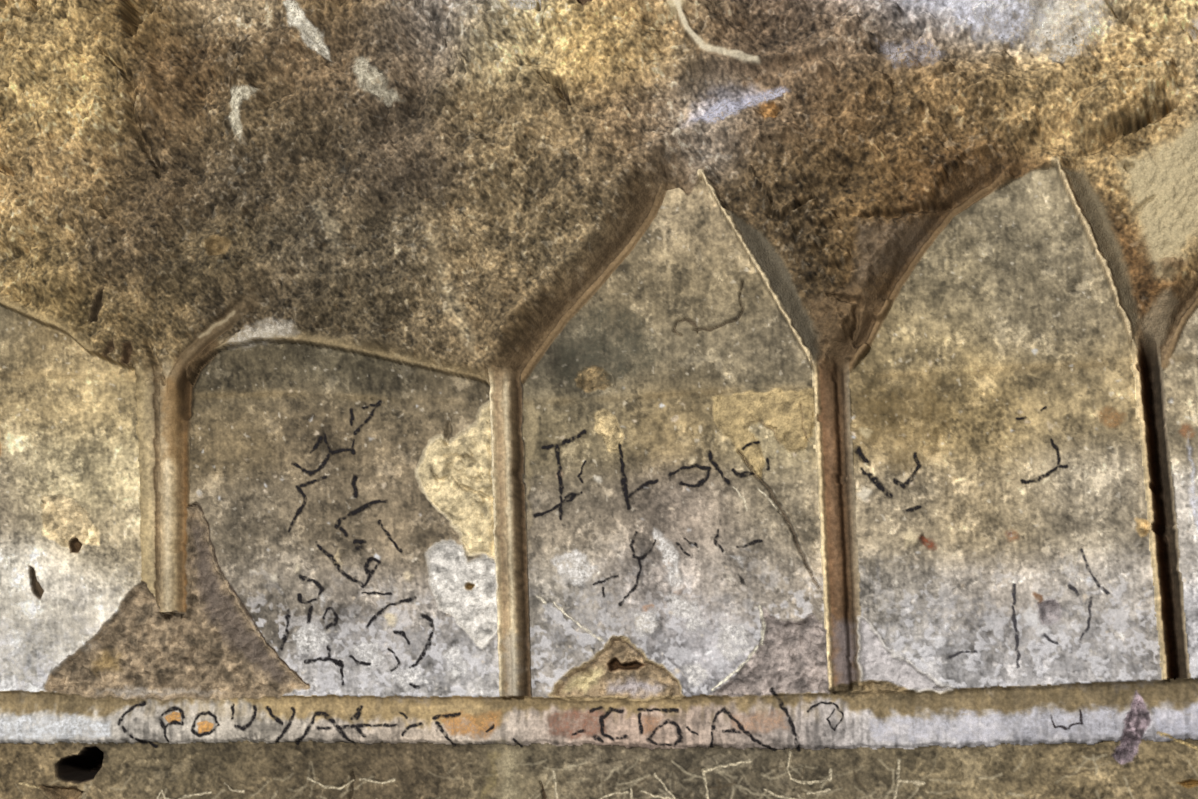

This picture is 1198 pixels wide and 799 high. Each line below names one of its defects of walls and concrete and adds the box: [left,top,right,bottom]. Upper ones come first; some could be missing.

spalling [26,0,41,15]
spalling [117,0,165,42]
leakage [923,0,1103,60]
flaking render [170,55,299,123]
flaking render [646,58,800,140]
leakage [701,89,785,121]
spalling [87,285,107,326]
spalling [101,336,135,371]
flaking render [415,395,499,649]
flaking render [39,494,313,703]
flaking render [549,636,684,702]